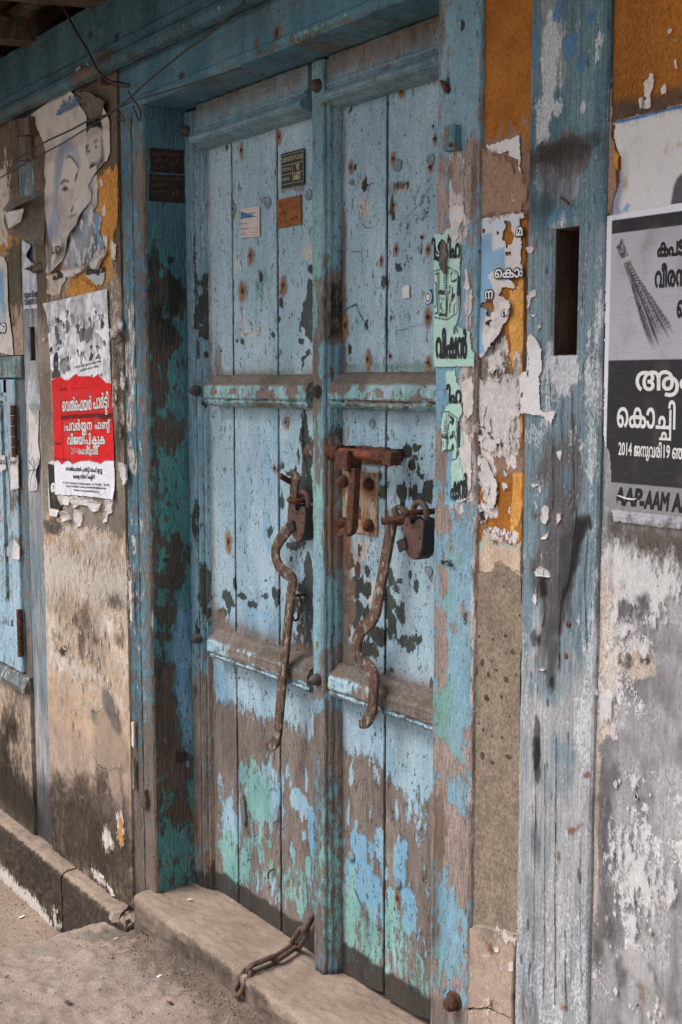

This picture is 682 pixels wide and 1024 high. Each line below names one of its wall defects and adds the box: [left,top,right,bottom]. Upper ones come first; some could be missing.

peeling [638,73,666,109]
peeling [482,147,527,223]
peeling [479,347,520,458]
peeling [478,471,508,523]
leakage [538,577,546,596]
leakage [562,514,590,597]
leakage [91,690,119,732]
leakage [0,718,135,901]
peeling [602,771,678,958]
peeling [629,996,662,1024]